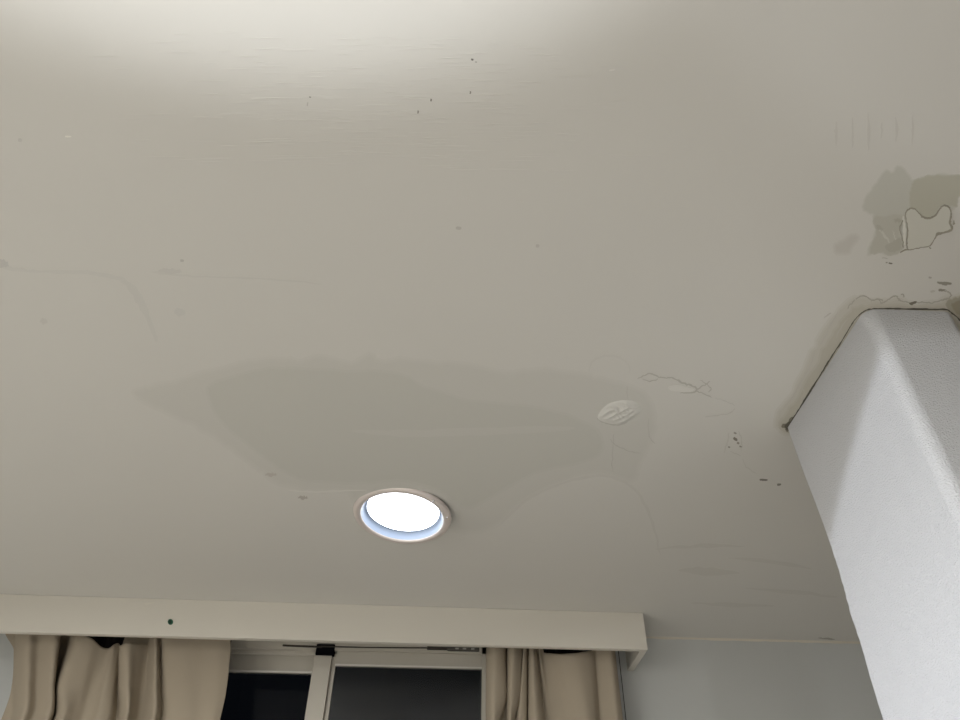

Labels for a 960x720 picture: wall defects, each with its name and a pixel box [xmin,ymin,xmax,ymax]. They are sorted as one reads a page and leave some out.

peeling [902,206,951,249]
crack [639,373,712,398]
water stain [131,352,658,535]